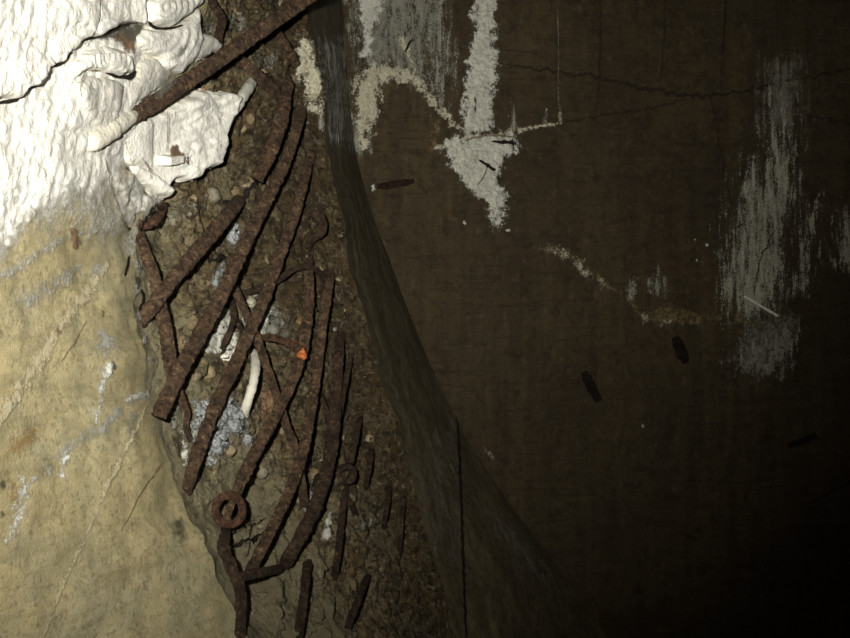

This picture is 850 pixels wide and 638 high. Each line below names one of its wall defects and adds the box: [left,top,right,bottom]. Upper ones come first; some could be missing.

crack [502,63,850,100]
leakage [293,0,519,231]
crack [498,98,562,135]
corrosion [169,144,189,165]
leakage [701,66,850,387]
spalling [133,0,456,638]
corrosion [254,384,274,423]